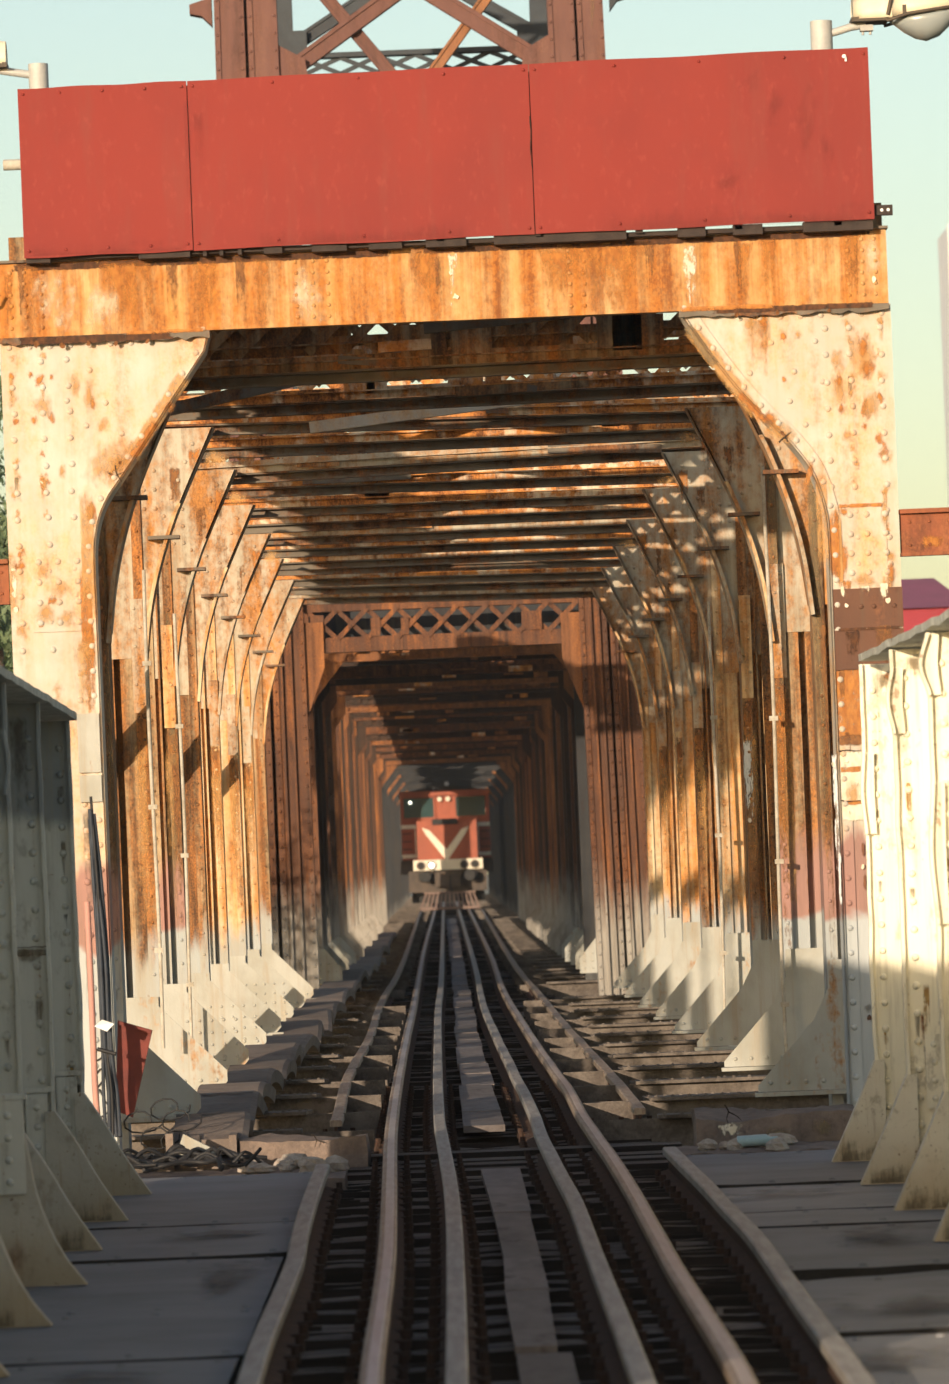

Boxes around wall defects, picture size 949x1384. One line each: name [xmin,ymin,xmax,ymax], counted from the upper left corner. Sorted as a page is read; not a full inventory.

rust [5,250,390,314]
rust [414,231,869,305]
rust [9,328,203,430]
rust [94,375,187,478]
rust [682,302,888,466]
rust [169,449,244,536]
rust [805,465,894,589]
rust [18,503,96,709]
rust [835,625,900,745]
rust [135,713,149,860]
rust [167,728,177,821]
rust [211,747,254,857]